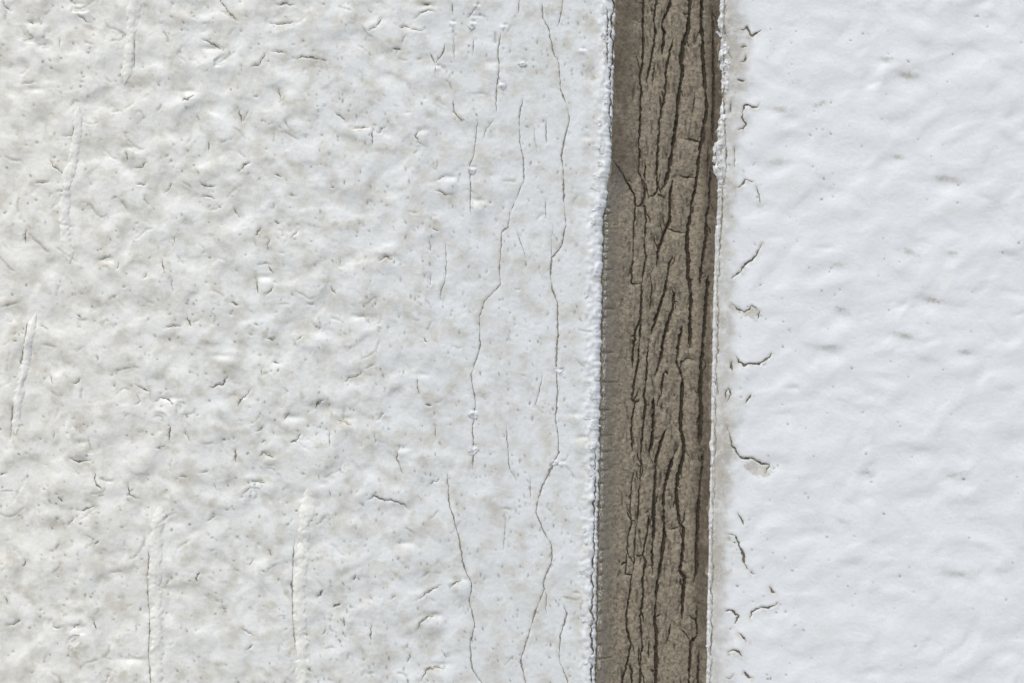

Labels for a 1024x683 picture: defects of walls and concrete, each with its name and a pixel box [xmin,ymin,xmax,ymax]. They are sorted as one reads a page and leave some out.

crack [407,474,482,683]
crack [430,0,778,683]